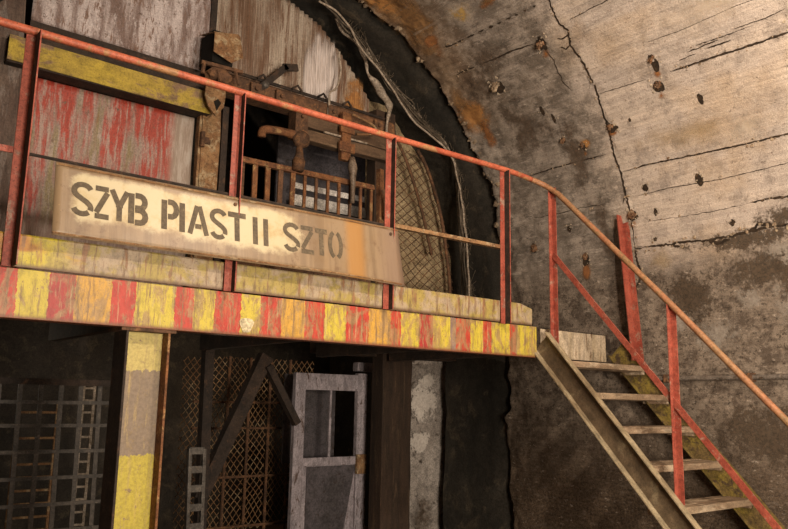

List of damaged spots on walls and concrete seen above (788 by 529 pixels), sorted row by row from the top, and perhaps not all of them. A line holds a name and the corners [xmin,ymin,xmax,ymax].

rust [366,0,440,54]
rust [453,90,496,146]
crack [442,0,788,291]